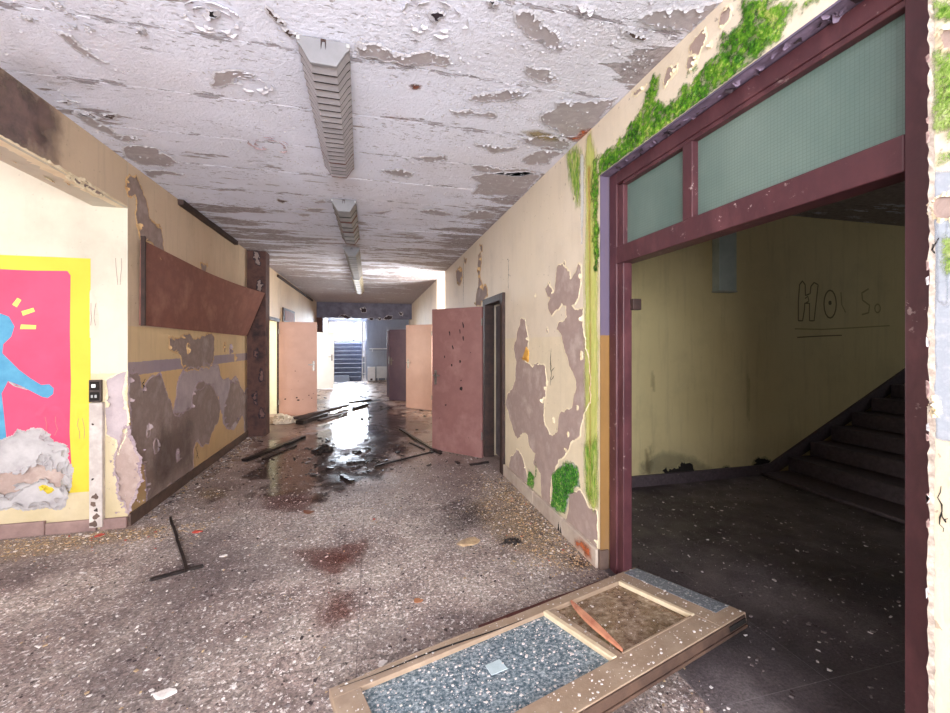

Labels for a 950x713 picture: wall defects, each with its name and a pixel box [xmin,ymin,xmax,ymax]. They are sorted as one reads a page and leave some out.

peeling [202,69,256,88]
peeling [260,3,302,40]
peeling [354,37,461,74]
peeling [448,64,560,119]
peeling [510,0,572,54]
peeling [0,94,186,259]
peeling [470,93,619,197]
peeling [456,244,488,307]
peeling [505,260,591,506]
peeling [105,332,266,515]
peeling [0,427,74,512]
peeling [566,489,599,548]